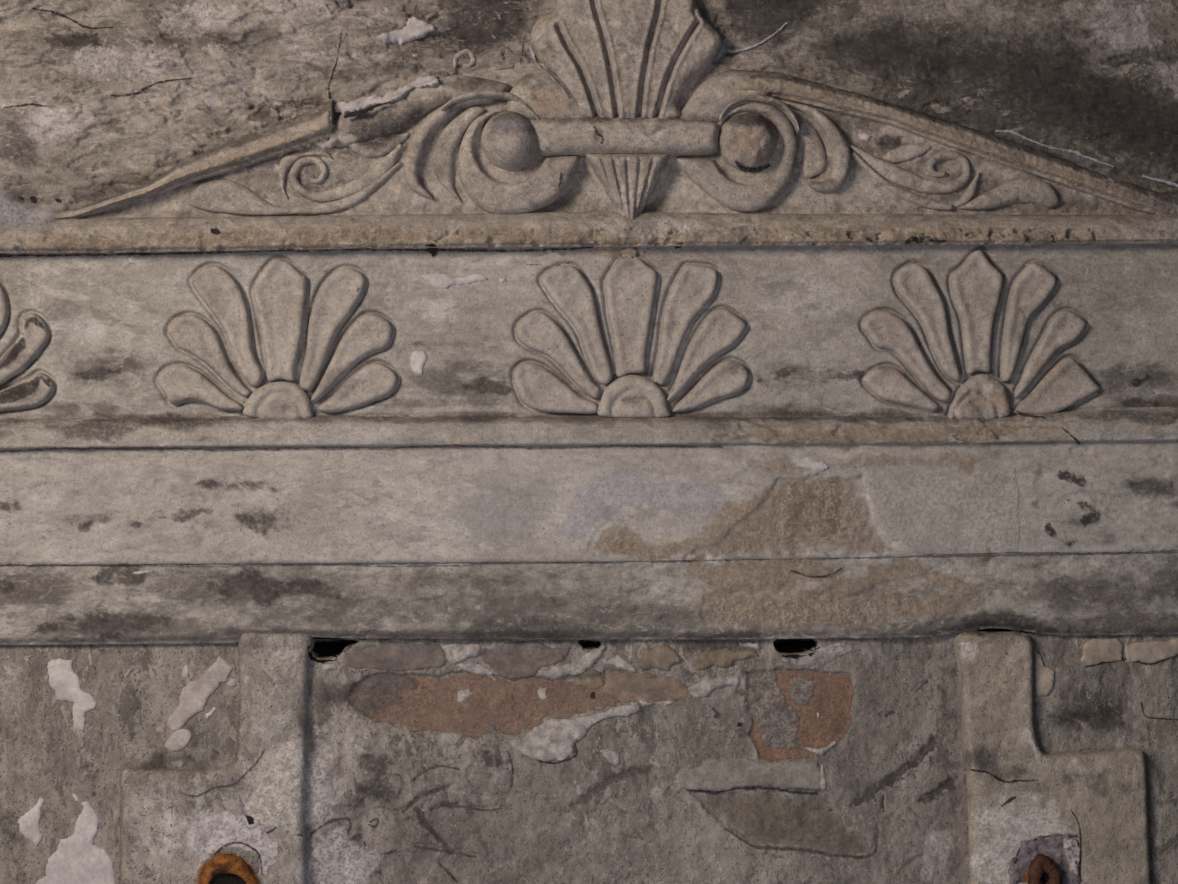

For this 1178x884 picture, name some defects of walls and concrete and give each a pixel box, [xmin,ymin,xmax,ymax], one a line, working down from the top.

spalling [231,75,439,168]
crack [0,246,592,257]
crack [0,444,723,452]
crack [0,562,592,575]
peeling [1081,638,1178,668]
peeling [47,658,97,731]
peeling [156,656,236,751]
flaking render [337,640,693,788]
spalling [564,749,650,813]
peeling [17,797,44,846]
peeling [36,794,116,884]
crack [214,842,262,874]